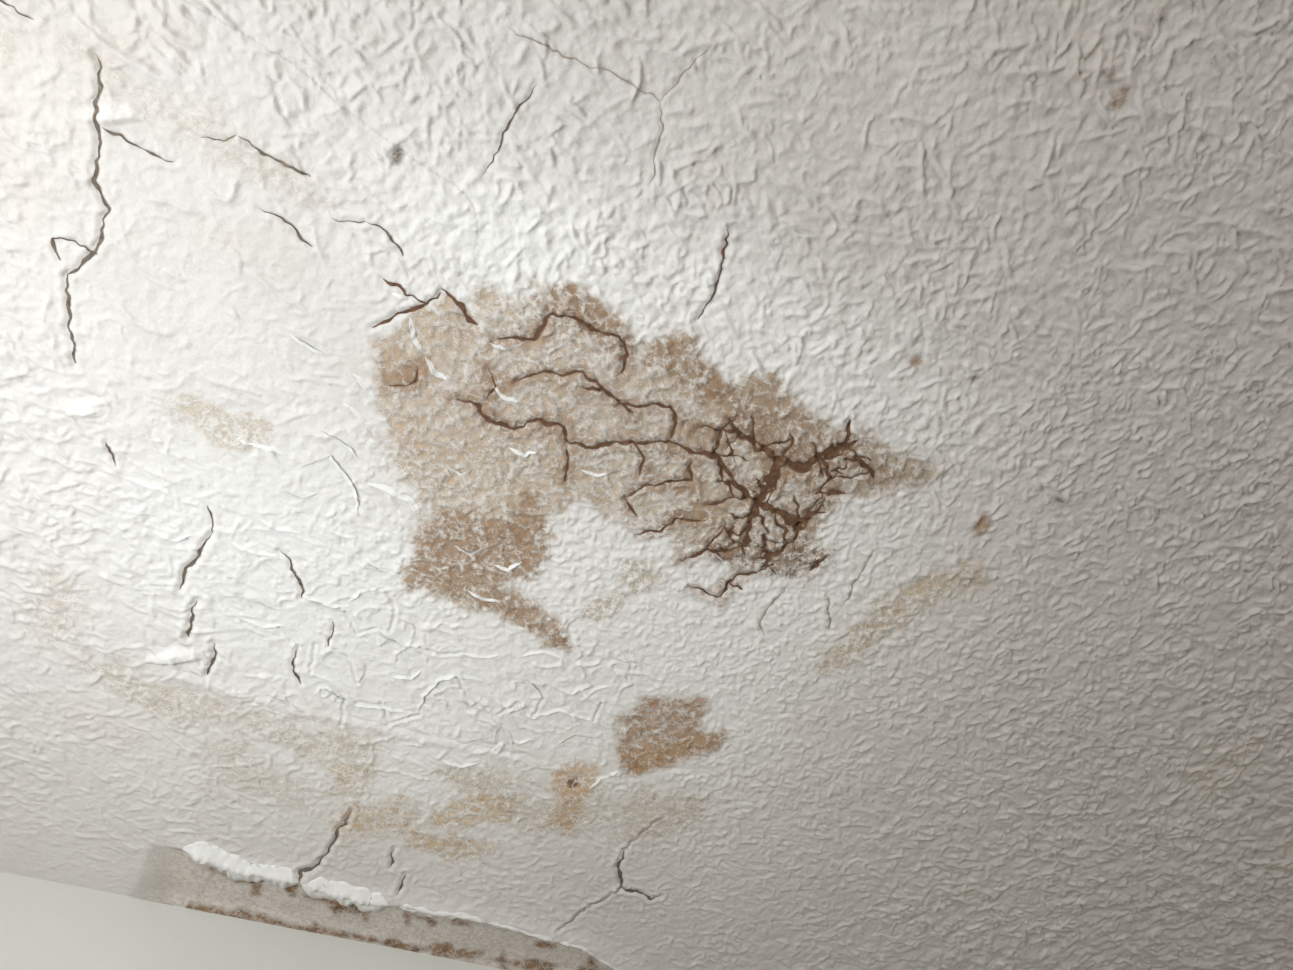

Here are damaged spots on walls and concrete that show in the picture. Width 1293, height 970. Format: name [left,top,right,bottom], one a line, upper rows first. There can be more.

crack [51,54,173,363]
crack [201,135,311,177]
crack [259,208,311,246]
crack [332,218,875,634]
leakage [373,285,935,650]
crack [180,505,217,675]
leakage [825,565,982,673]
leakage [618,698,723,774]
crack [298,810,352,883]
peeling [147,841,617,970]
crack [558,816,664,931]